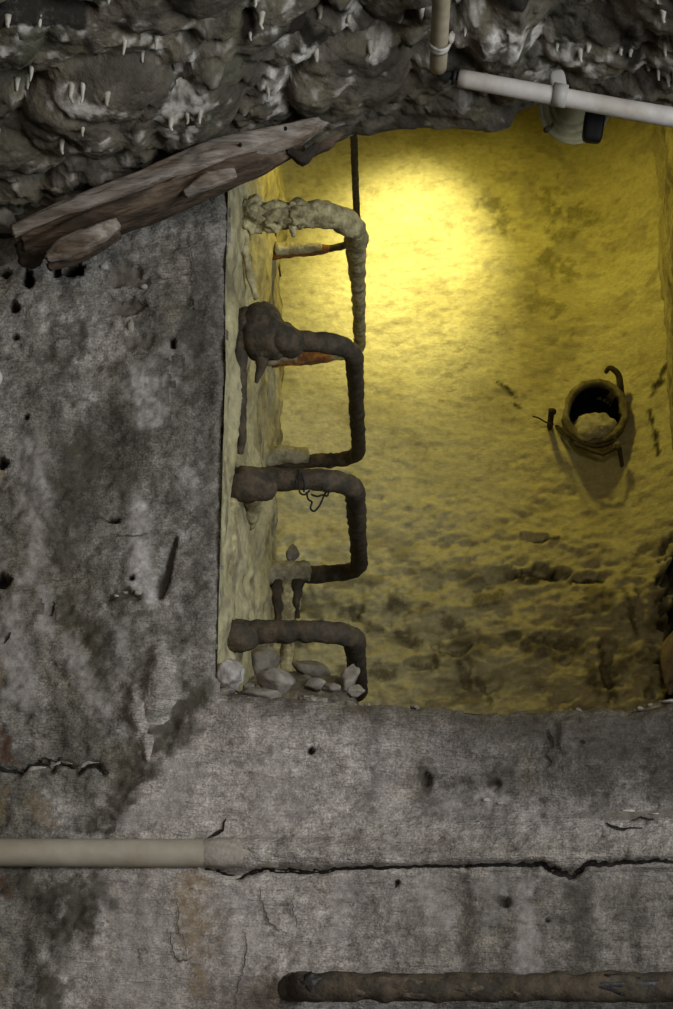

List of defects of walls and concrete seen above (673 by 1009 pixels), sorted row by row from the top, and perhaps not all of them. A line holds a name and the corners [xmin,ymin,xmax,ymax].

damp [129,371,162,428]
efflorescence [129,502,158,603]
crack [0,757,105,775]
damp [78,681,212,833]
crack [208,818,226,838]
crack [605,816,655,831]
damp [12,873,118,1009]
crack [170,900,194,962]
crack [234,931,247,1009]
crack [205,858,673,931]